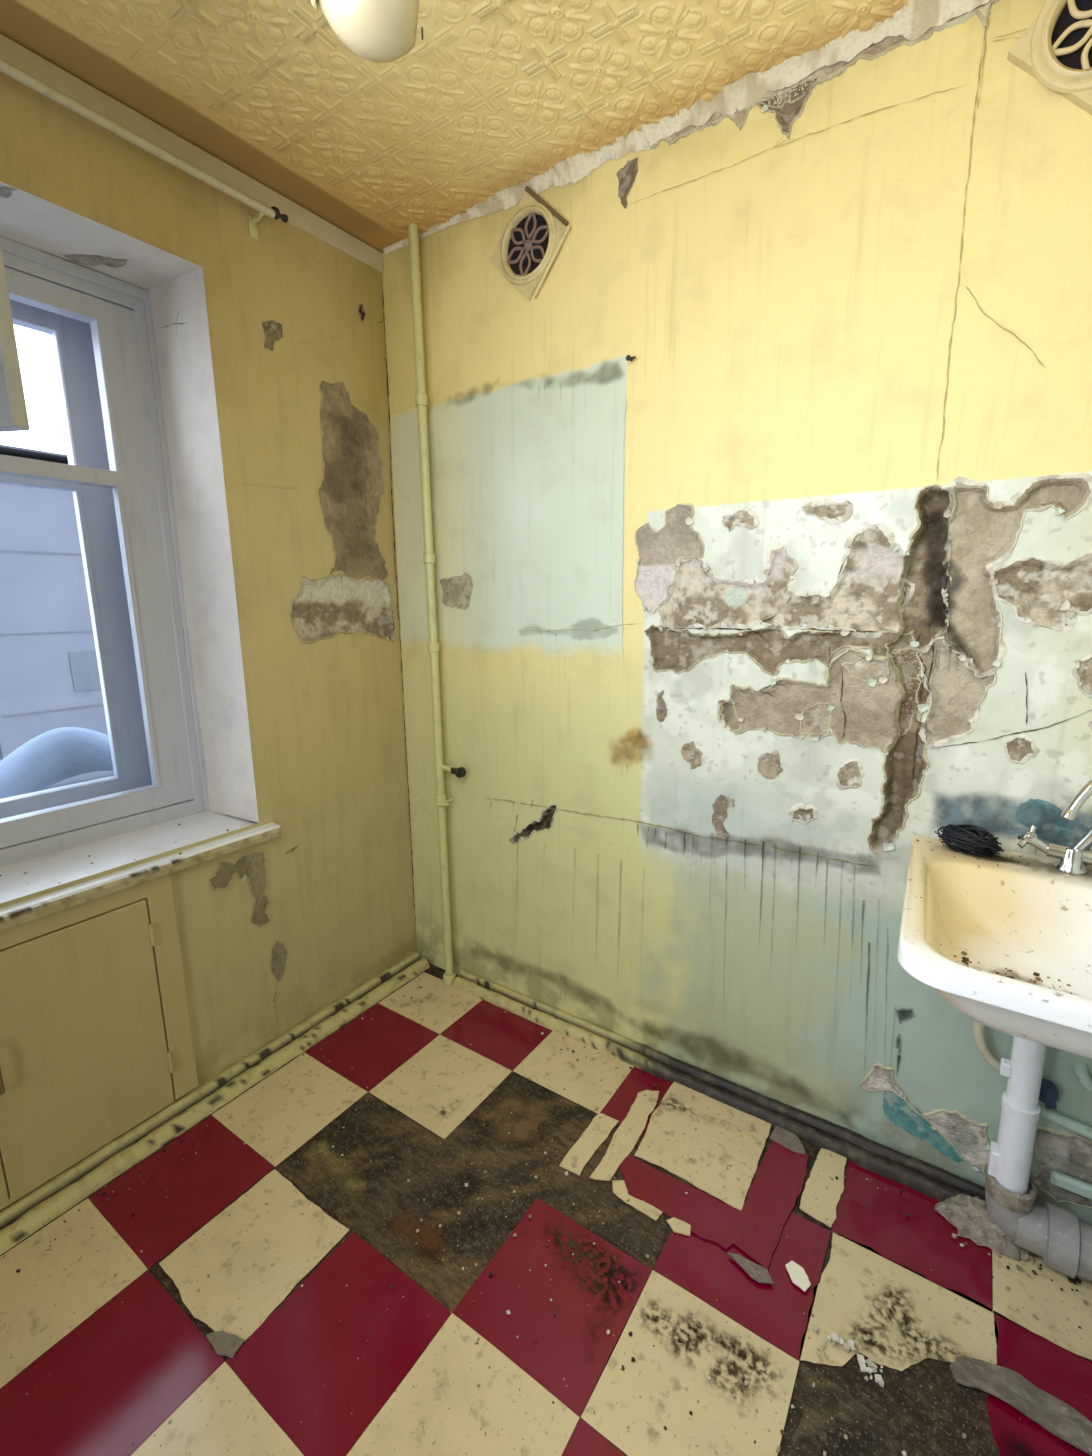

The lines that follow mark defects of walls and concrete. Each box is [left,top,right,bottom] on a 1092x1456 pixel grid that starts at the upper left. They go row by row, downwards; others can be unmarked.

spalling [603,0,999,209]
crack [635,0,1045,482]
peeling [289,380,396,644]
peeling [440,572,473,610]
crack [521,597,1091,781]
spalling [634,473,1092,856]
spalling [508,803,559,845]
peeling [275,1072,692,1313]
peeling [791,1139,838,1233]
spalling [860,1063,990,1173]
spalling [1033,1125,1092,1209]
peeling [788,1363,918,1456]